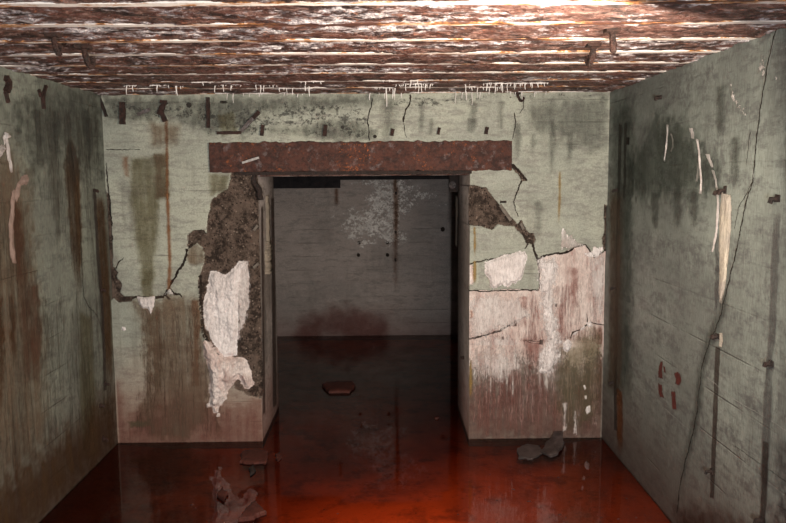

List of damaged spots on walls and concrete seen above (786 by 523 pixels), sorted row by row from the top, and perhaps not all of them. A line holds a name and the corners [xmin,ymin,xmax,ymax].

damp [0,132,29,264]
crack [106,149,140,225]
crack [134,249,219,355]
spalling [188,172,263,397]
damp [333,179,446,248]
crack [469,321,515,340]
spalling [468,185,536,244]
crack [512,164,527,216]
damp [469,251,601,435]
crack [469,243,606,266]
peeling [469,205,606,374]
damp [561,228,604,317]